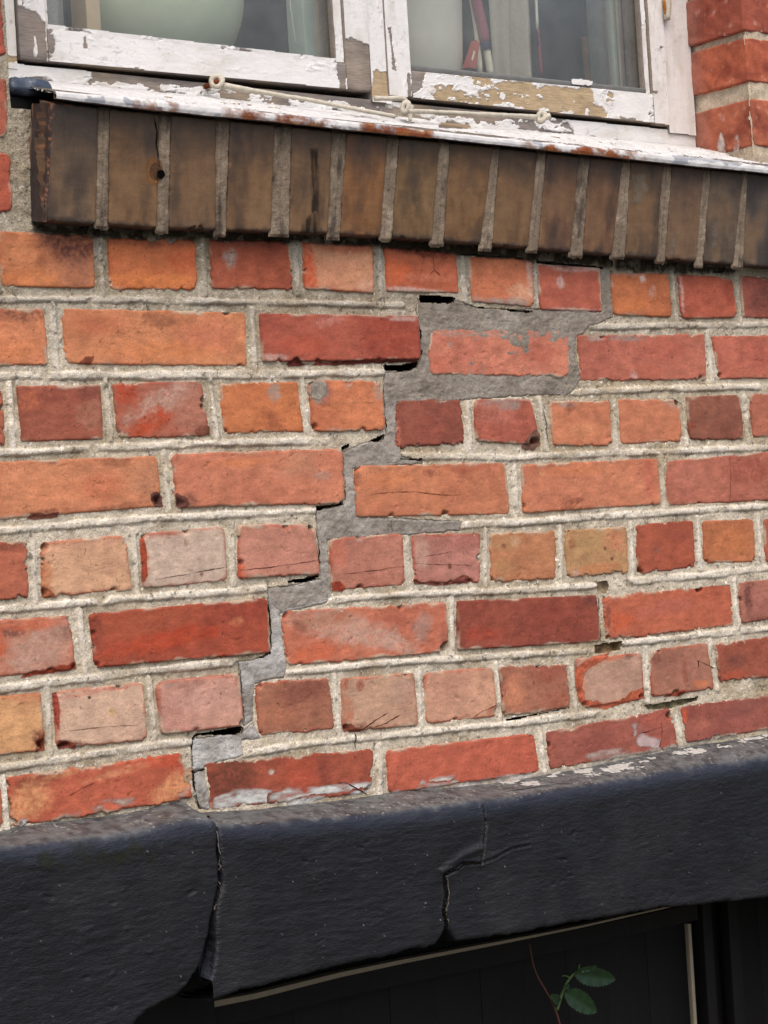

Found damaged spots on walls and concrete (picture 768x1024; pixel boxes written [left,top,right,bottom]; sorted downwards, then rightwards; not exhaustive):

peeling [371,70,389,97]
peeling [431,75,614,118]
crack [155,257,533,910]
crack [442,812,528,930]
crack [200,936,220,981]